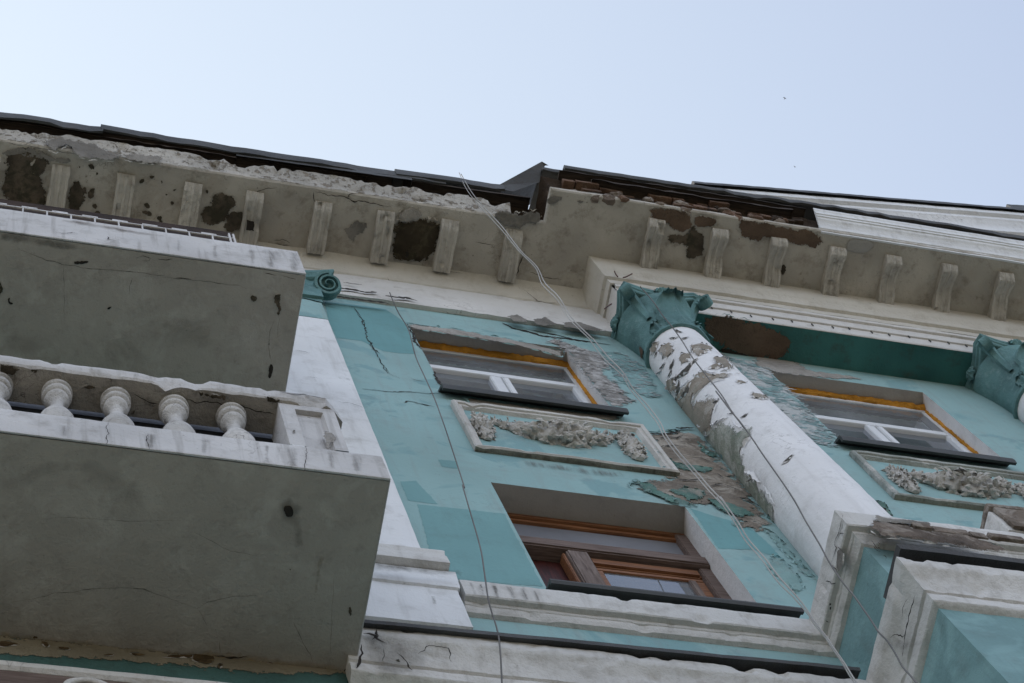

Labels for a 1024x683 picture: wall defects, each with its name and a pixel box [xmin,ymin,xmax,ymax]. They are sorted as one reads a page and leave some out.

spalling [68,181,100,213]
spalling [2,137,167,205]
spalling [199,189,243,234]
spalling [389,206,440,263]
flaking render [492,179,824,260]
crack [183,279,441,414]
peeling [406,313,861,594]
flaking render [864,500,1024,555]
crack [296,586,451,671]
crack [890,596,915,655]